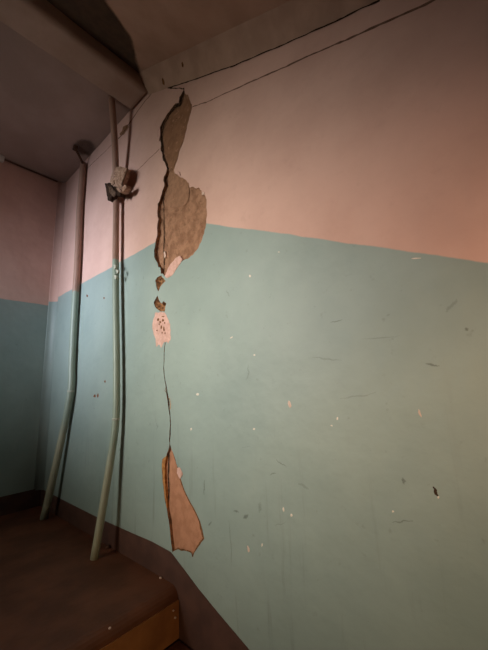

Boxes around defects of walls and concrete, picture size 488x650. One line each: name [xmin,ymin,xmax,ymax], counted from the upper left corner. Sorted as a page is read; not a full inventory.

crack [168,0,435,107]
spalling [154,91,207,290]
peeling [152,298,171,347]
spalling [162,449,204,557]